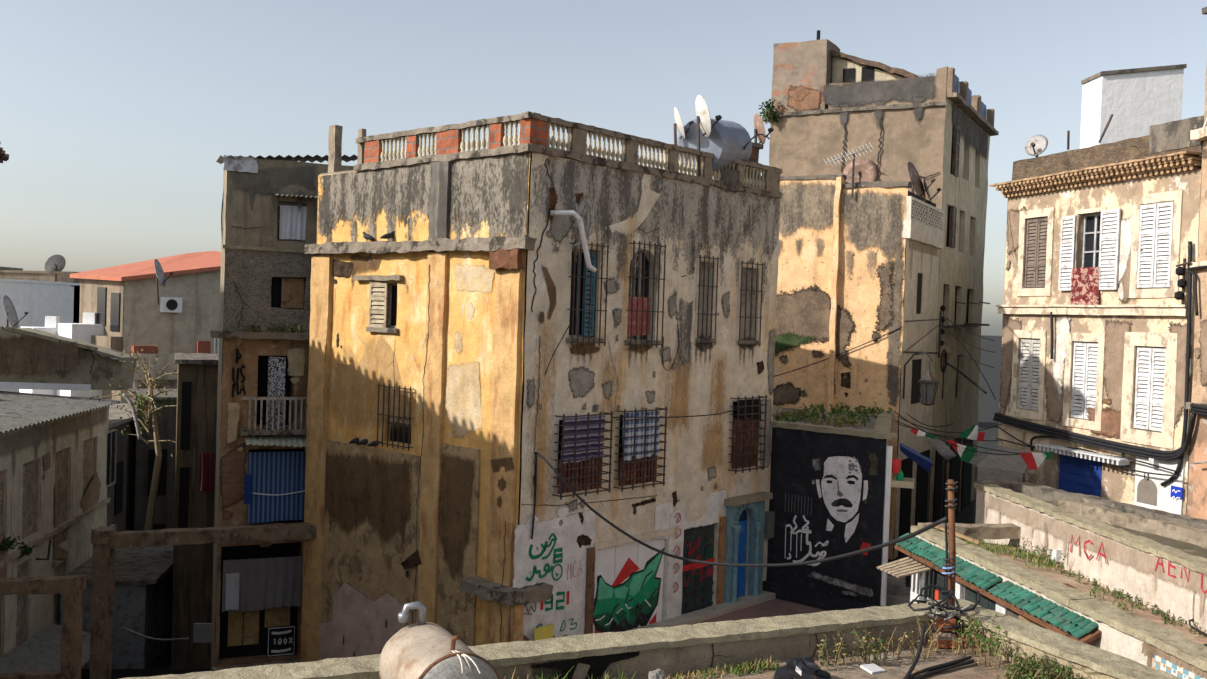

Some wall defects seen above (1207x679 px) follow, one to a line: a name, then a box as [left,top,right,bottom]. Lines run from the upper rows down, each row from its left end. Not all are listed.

damp [231,164,432,285]
damp [449,153,938,406]
peeling [871,260,896,343]
peeling [568,367,620,412]
peeling [641,346,677,412]
peeling [757,284,855,469]
damp [324,452,412,553]
damp [439,455,475,579]
peeling [320,582,406,660]